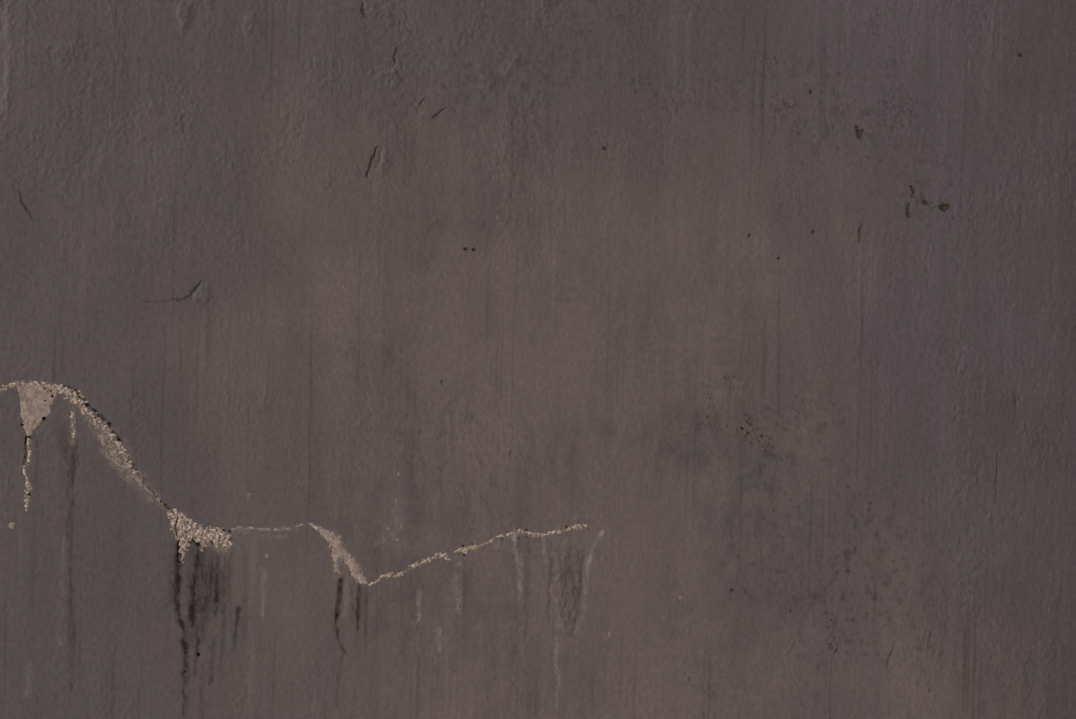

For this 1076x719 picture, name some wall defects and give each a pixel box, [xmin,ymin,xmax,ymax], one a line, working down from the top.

crack [0,380,173,511]
water stain [175,554,200,673]
crack [230,523,310,531]
crack [369,524,588,585]